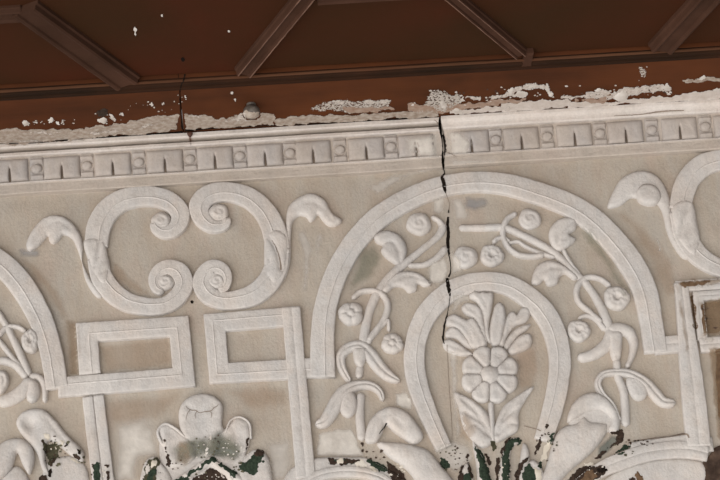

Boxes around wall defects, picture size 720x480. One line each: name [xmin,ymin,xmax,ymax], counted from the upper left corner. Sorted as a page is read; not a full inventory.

peeling [95,108,124,124]
crack [0,74,277,144]
crack [295,116,457,426]
peeling [39,433,110,480]
peeling [142,435,265,480]
leakage [179,434,237,458]
peeling [328,442,406,480]
peeling [440,424,558,480]
peeling [569,429,653,480]